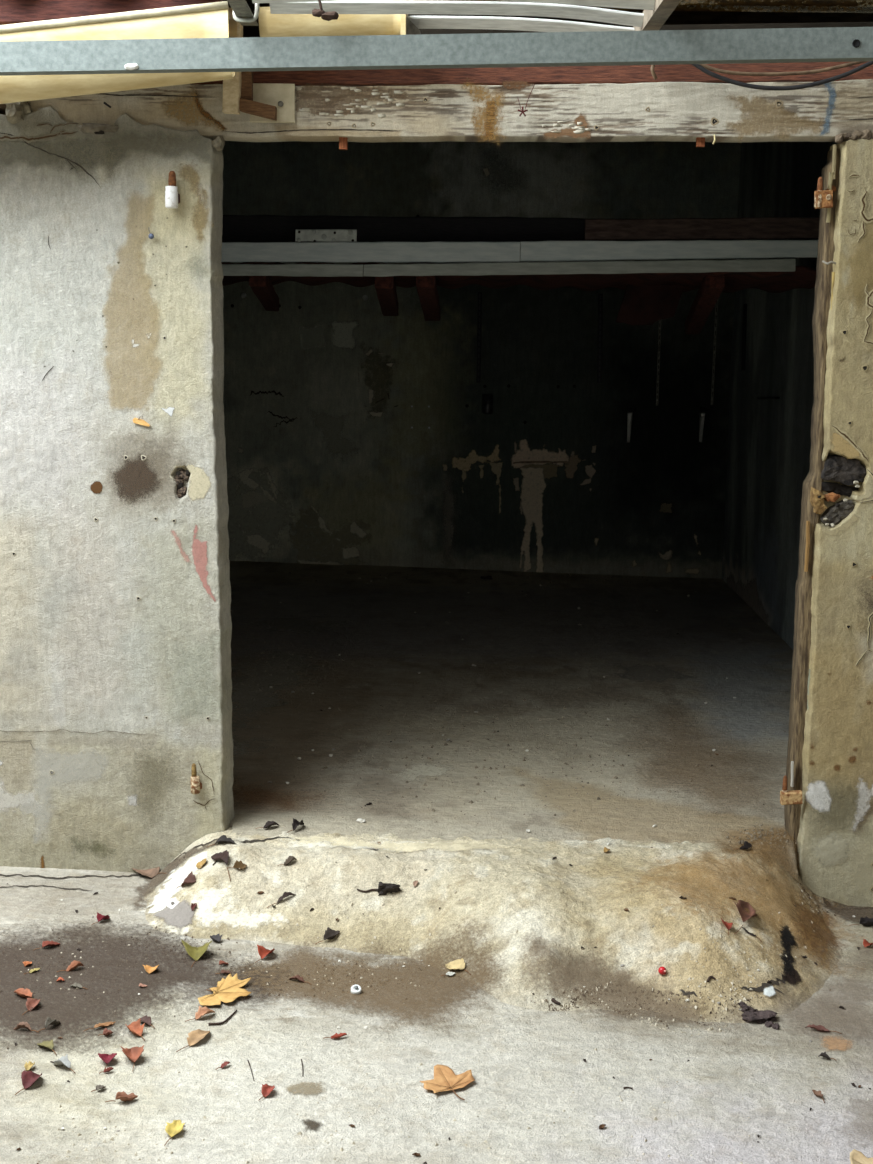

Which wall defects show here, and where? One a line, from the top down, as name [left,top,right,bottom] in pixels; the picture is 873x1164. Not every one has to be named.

rust [466,83,503,140]
crack [847,173,873,243]
crack [863,284,873,345]
leakage [114,456,157,501]
spalling [810,433,873,536]
crack [832,426,873,504]
crack [855,612,873,666]
leakage [0,923,502,1050]